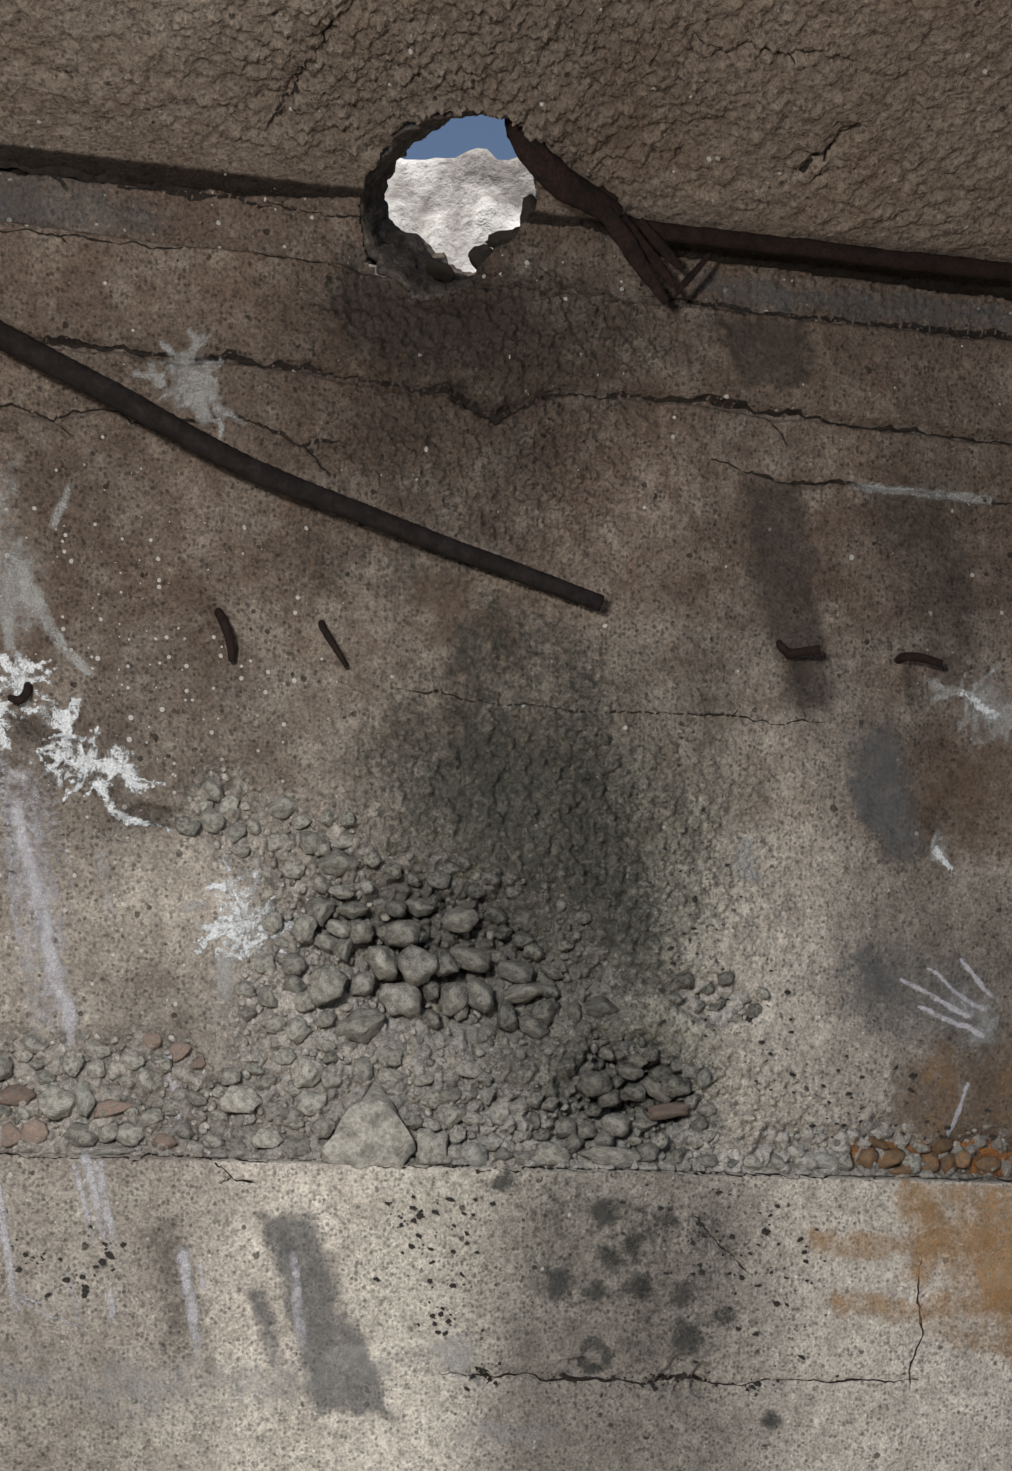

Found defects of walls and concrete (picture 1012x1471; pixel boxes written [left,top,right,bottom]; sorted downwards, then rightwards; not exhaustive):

crack [645,296,1012,341]
crack [0,402,140,436]
crack [41,335,1012,505]
damp [52,502,66,526]
damp [0,555,170,1045]
spalling [647,896,725,995]
corrosion [848,1049,1012,1177]
crack [439,1256,924,1389]